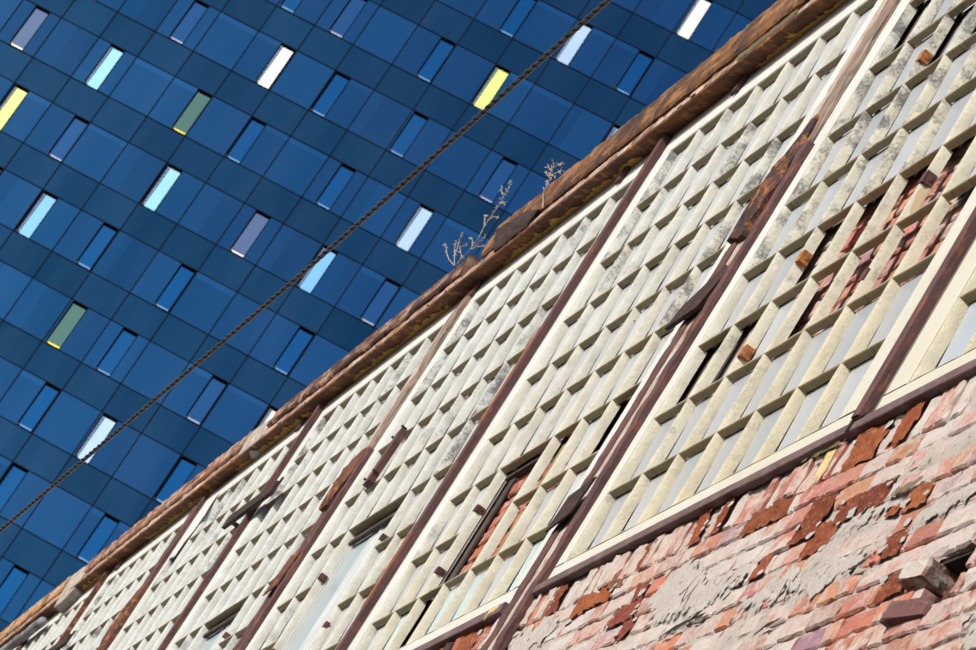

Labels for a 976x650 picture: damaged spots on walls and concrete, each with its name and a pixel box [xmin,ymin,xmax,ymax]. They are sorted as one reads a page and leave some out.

corrosion [727,114,820,244]
spalling [839,400,929,474]
corrosion [319,447,367,512]
peeling [603,478,976,642]
peeling [509,578,620,650]
peeling [961,611,976,650]